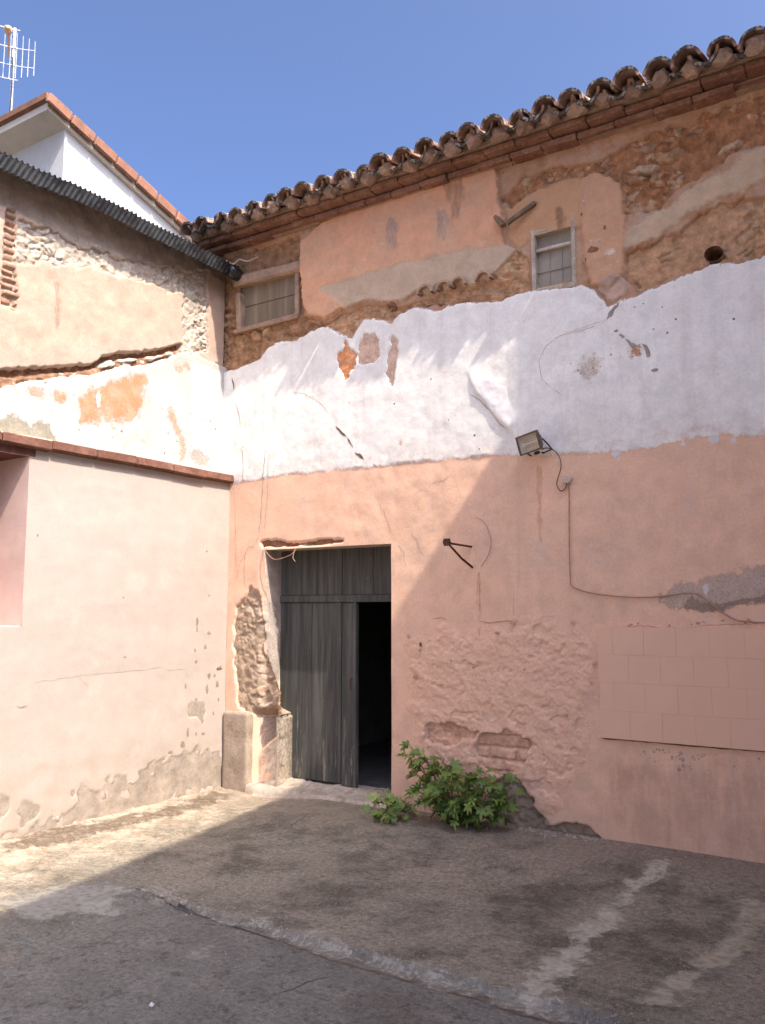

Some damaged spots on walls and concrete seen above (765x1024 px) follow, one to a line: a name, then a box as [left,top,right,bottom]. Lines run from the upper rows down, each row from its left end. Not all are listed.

flaking render [0,208,19,311]
flaking render [585,225,619,263]
spalling [704,246,725,264]
flaking render [308,251,529,386]
crack [233,447,269,585]
peeling [659,565,765,625]
peeling [0,665,223,841]
flaking render [428,723,533,775]